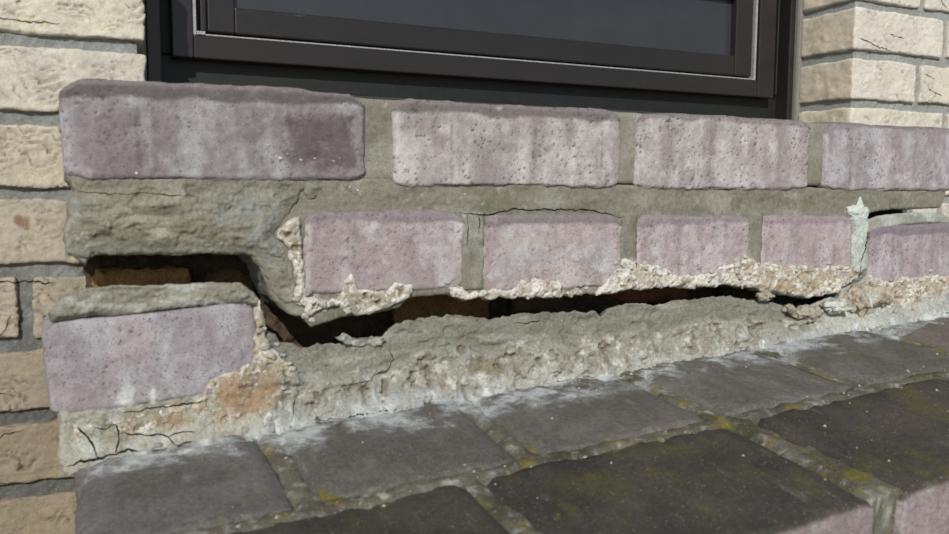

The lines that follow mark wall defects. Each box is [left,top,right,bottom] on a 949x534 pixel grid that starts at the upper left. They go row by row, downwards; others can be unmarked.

crack [463,208,621,242]
spalling [277,216,413,323]
spalling [445,255,949,314]
leakage [701,299,949,371]
spalling [110,300,296,450]
crack [66,400,206,471]
leakage [87,364,686,475]